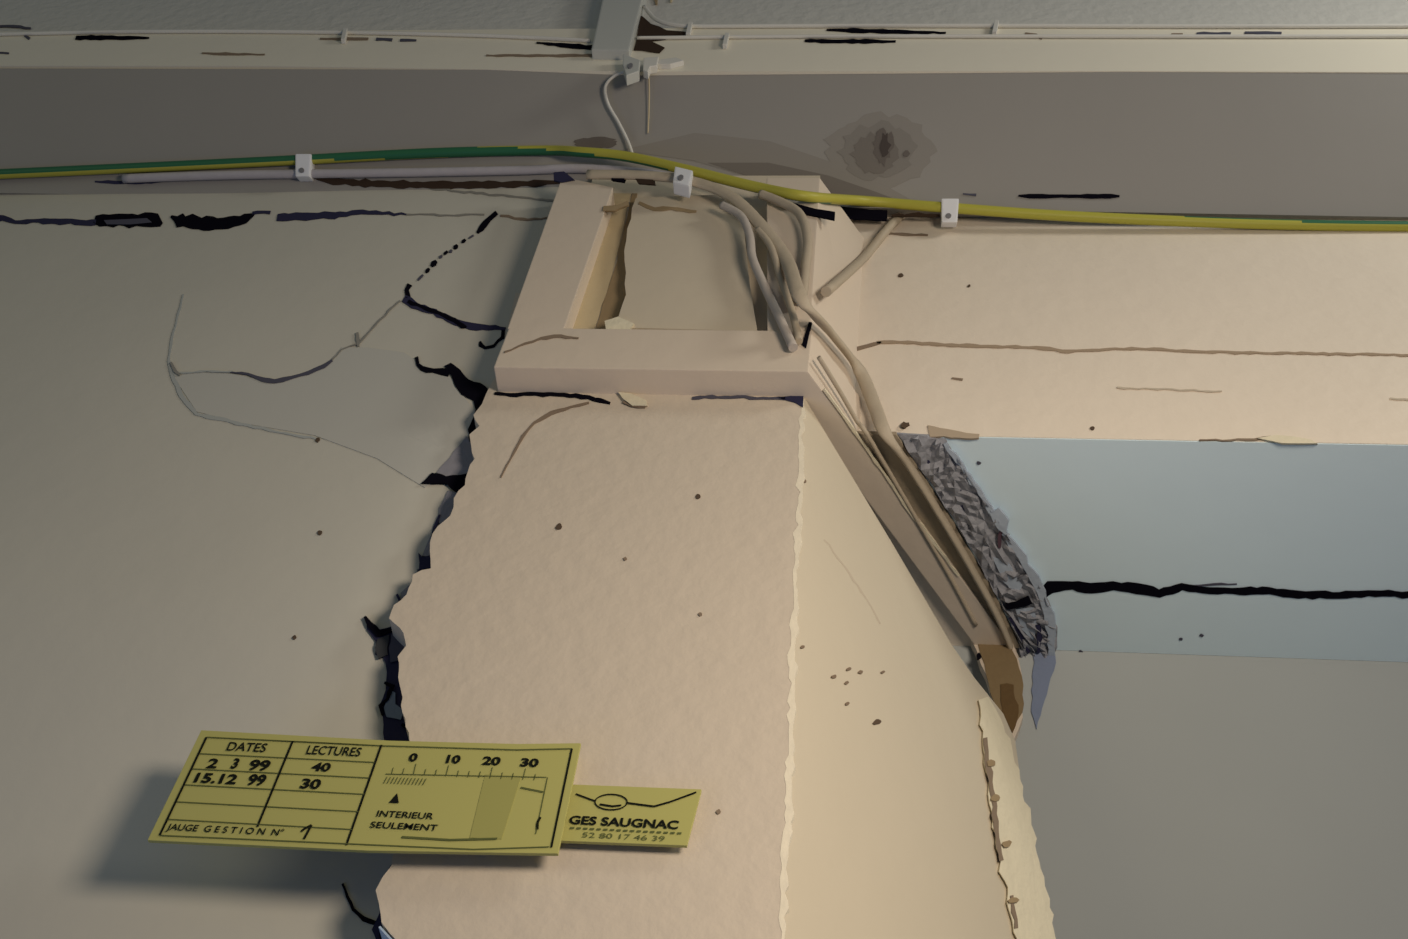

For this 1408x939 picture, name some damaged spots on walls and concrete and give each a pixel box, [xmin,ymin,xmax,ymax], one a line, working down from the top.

crack [0,178,645,741]
spalling [897,422,1058,658]
crack [1005,581,1408,653]
crack [983,737,1004,861]
crack [342,883,383,939]
crack [1010,895,1018,928]